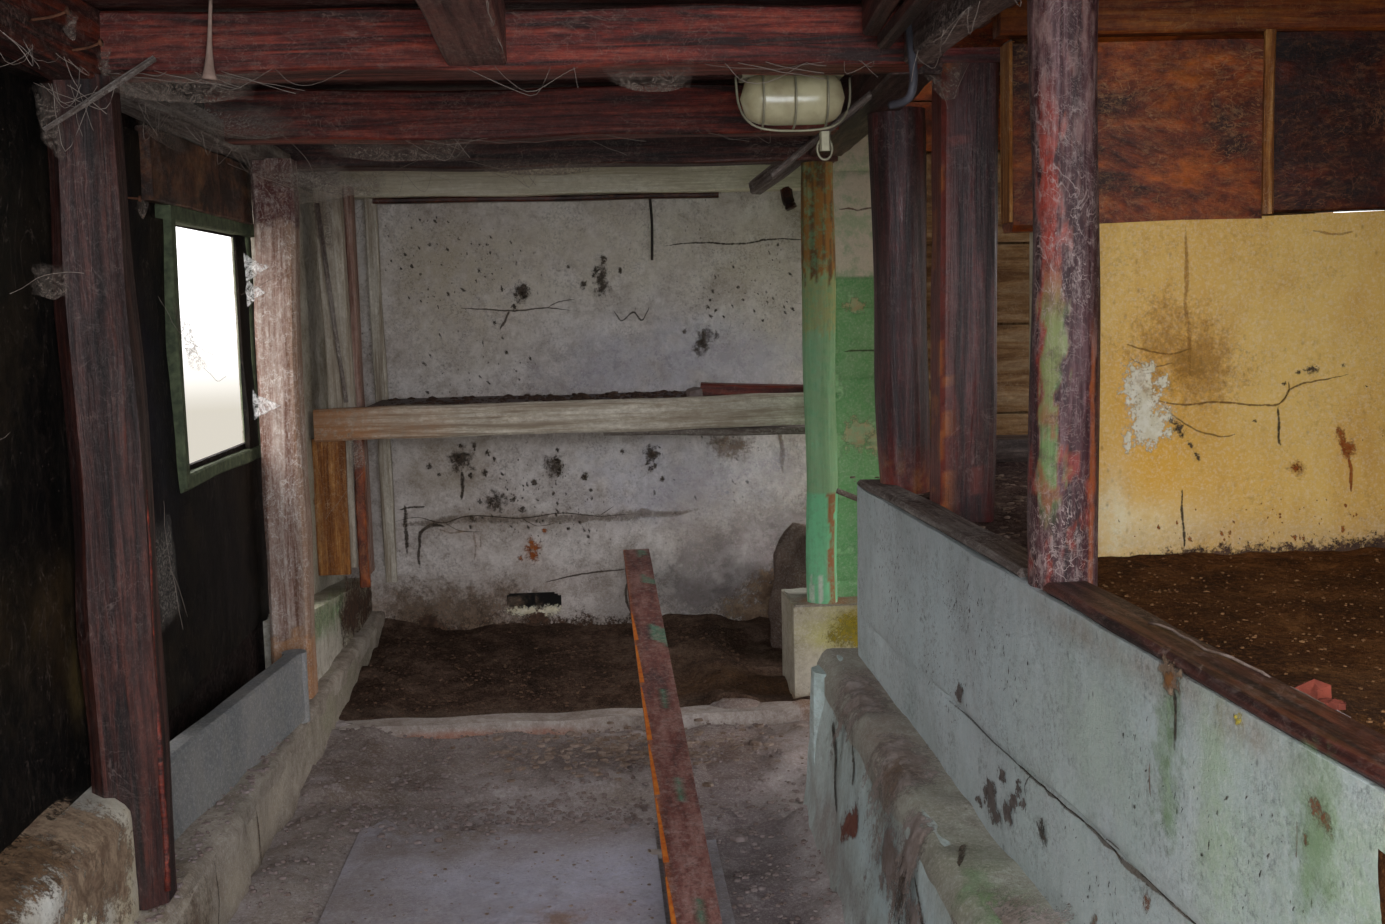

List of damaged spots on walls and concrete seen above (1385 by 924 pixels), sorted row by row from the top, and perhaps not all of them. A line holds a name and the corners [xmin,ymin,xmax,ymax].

peeling [1117,358,1177,454]
crack [1127,344,1341,437]
damp [426,443,525,529]
damp [531,448,565,486]
damp [643,444,664,482]
corrosion [1336,427,1356,491]
spalling [975,764,1046,845]
flaking render [18,799,135,924]
damp [957,844,967,867]